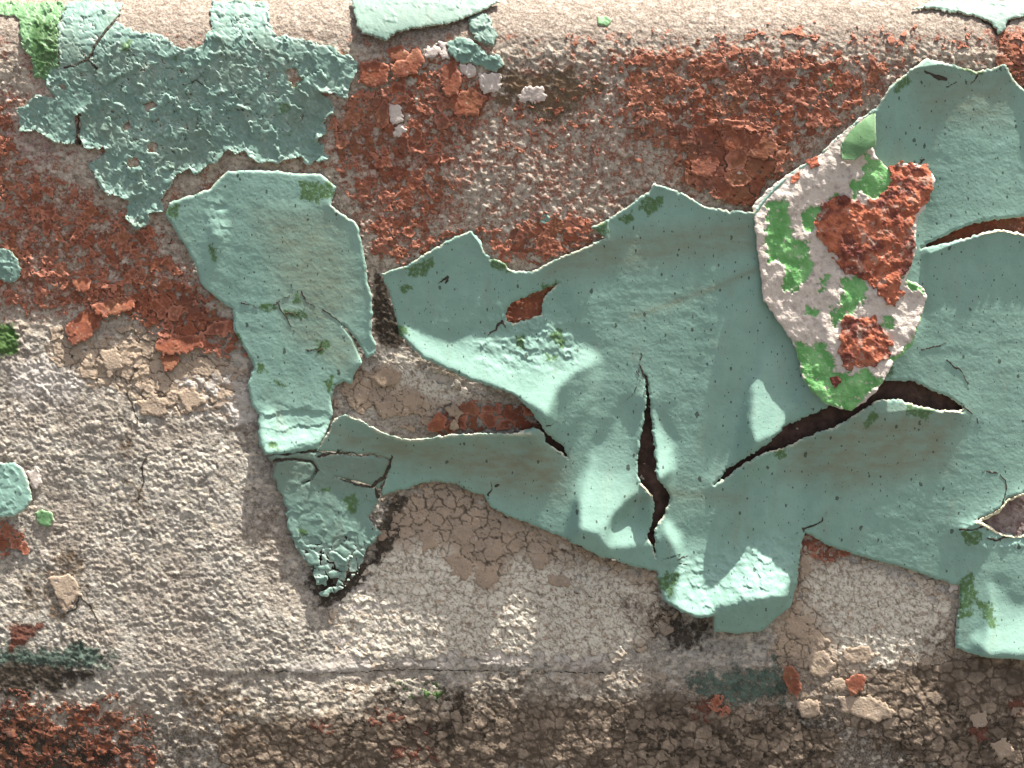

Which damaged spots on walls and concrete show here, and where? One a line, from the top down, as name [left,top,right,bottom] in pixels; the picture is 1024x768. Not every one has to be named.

peeling [0,0,358,345]
peeling [100,0,1024,660]
peeling [0,688,161,768]
crack [212,450,1024,768]